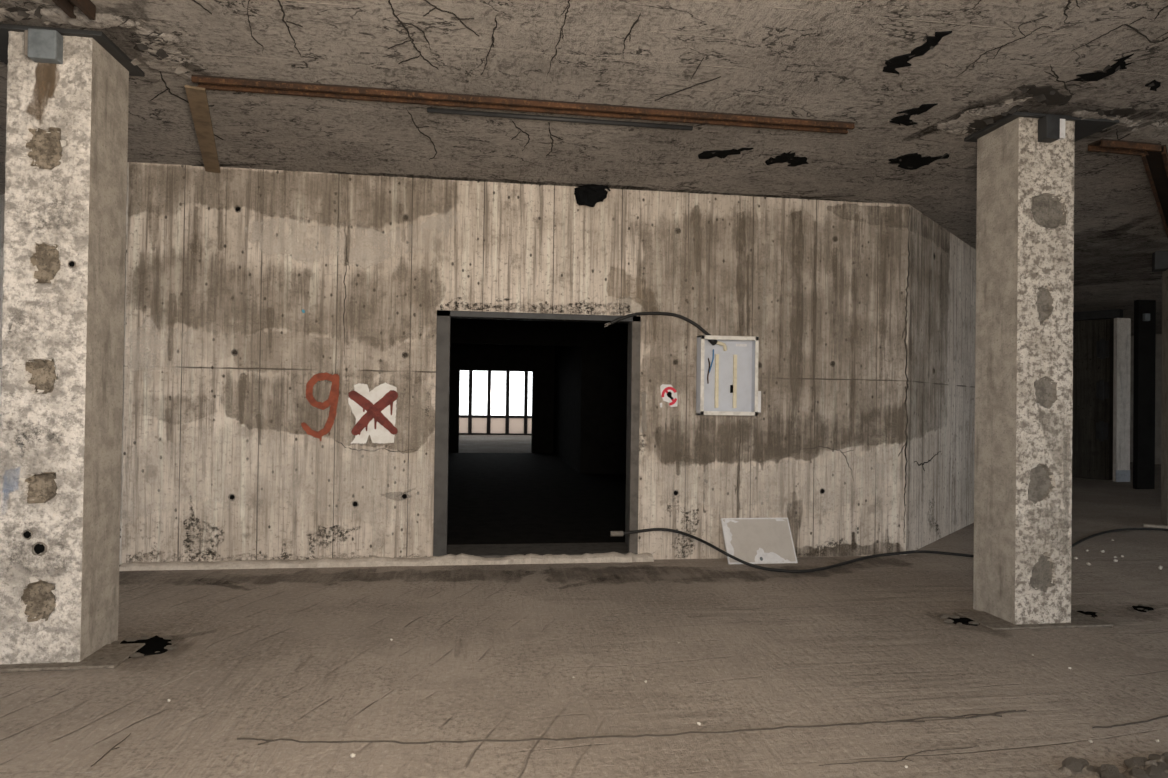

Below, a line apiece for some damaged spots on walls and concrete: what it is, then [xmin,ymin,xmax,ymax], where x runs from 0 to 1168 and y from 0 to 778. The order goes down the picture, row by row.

crack [247,0,303,57]
crack [388,0,497,75]
peeling [883,31,952,74]
crack [957,0,1168,98]
spalling [25,127,66,170]
spalling [30,240,76,284]
leakage [125,164,589,348]
spalling [21,359,60,394]
leakage [603,185,950,514]
leakage [226,373,435,453]
spalling [18,577,56,627]
crack [237,710,1027,745]